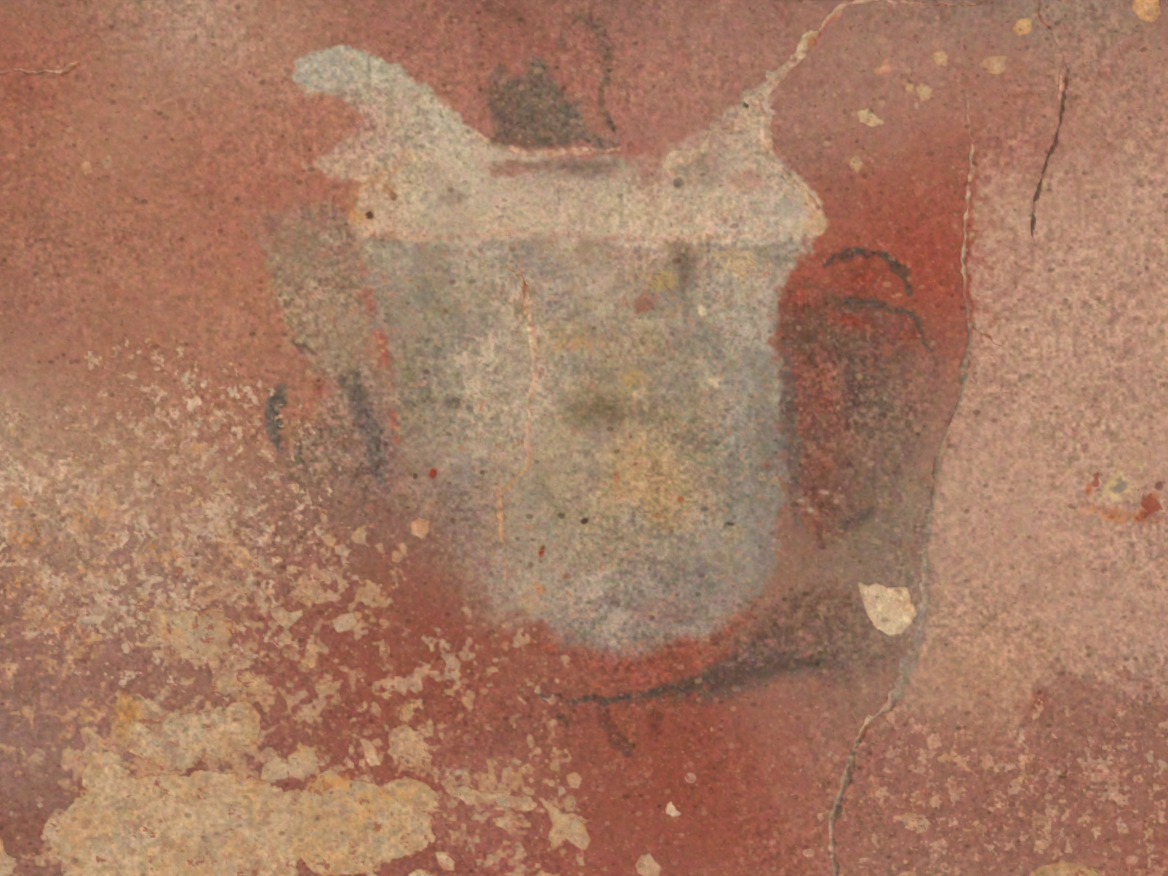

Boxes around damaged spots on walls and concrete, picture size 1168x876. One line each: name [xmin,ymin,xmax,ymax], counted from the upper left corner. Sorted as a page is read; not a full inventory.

crack [0,61,81,78]
crack [660,0,990,211]
crack [1029,0,1070,245]
damp [0,369,278,583]
crack [827,89,1002,876]
peeling [0,328,616,876]
flaking render [857,581,917,636]
flaking render [665,800,695,819]
peeling [684,771,697,785]
peeling [755,667,1168,876]